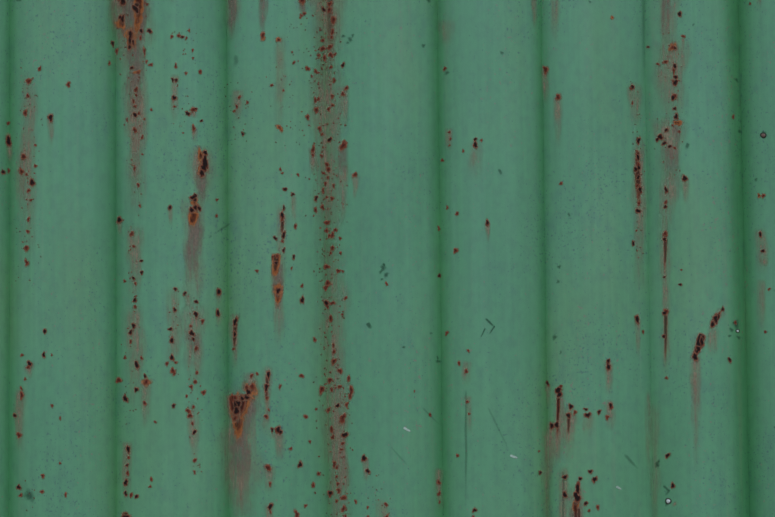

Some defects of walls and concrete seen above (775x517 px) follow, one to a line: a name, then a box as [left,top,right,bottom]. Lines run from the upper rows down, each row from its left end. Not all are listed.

rust [1,65,41,205]
rust [108,0,153,216]
rust [188,147,209,255]
rust [271,205,297,315]
rust [277,0,357,517]
rust [632,124,645,258]
rust [656,35,686,163]
rust [167,287,206,441]
rust [228,371,292,501]
rust [546,381,613,452]
rust [560,469,599,517]
rust [692,306,724,395]